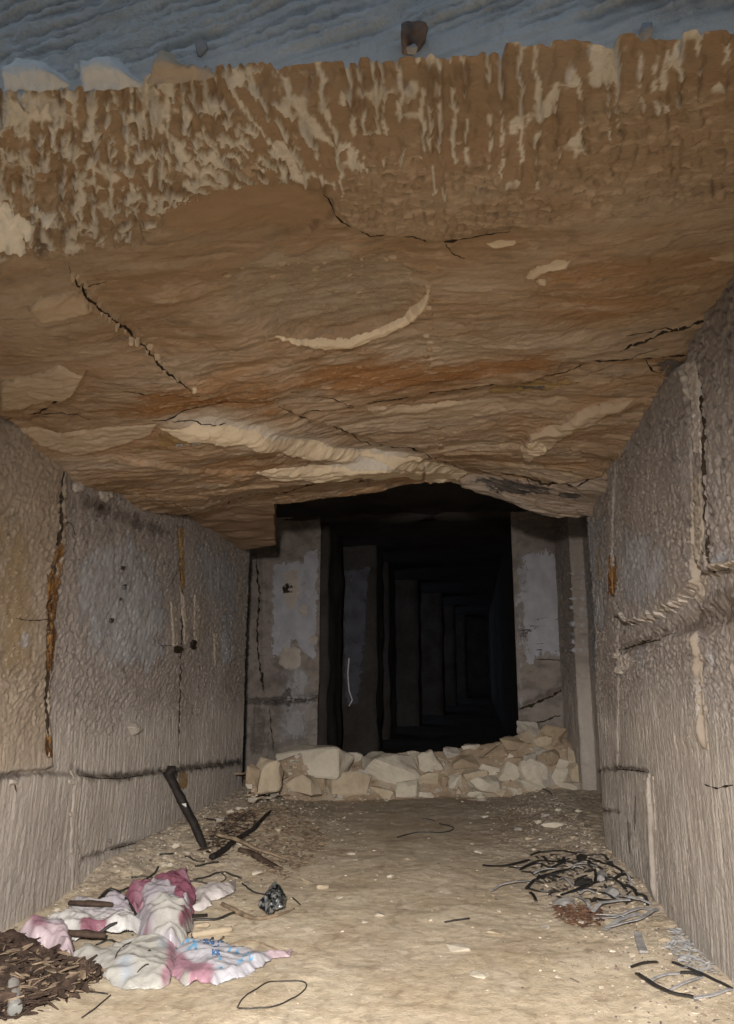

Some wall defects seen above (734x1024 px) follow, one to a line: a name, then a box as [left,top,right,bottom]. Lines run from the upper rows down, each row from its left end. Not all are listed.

crack [323,194,510,259]
crack [65,262,494,478]
crack [506,471,605,491]
crack [545,320,730,573]
rust [45,543,65,671]
rust [597,545,618,602]